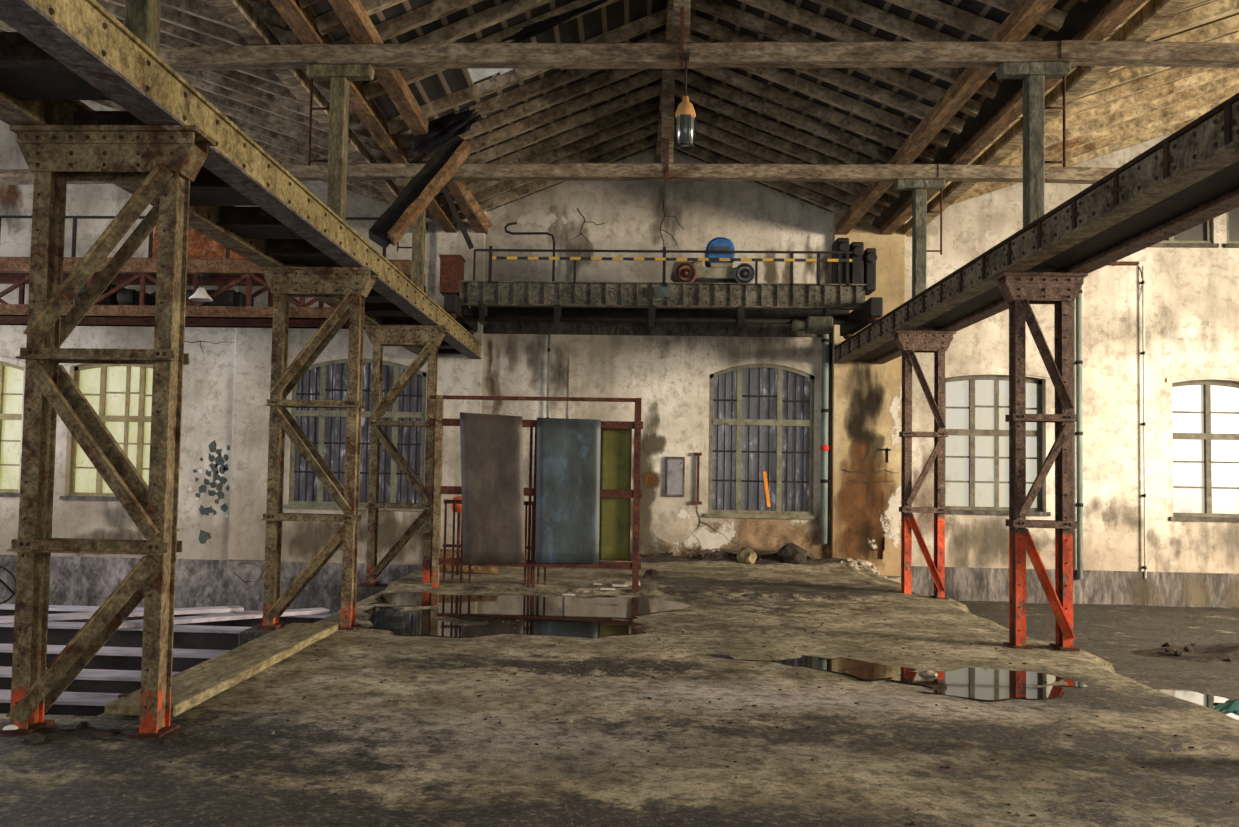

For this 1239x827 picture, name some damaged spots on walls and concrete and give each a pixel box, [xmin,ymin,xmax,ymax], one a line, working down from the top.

damp [549,214,593,271]
damp [845,367,884,467]
peeling [188,440,230,517]
peeling [199,530,211,544]
flaking render [660,508,828,559]